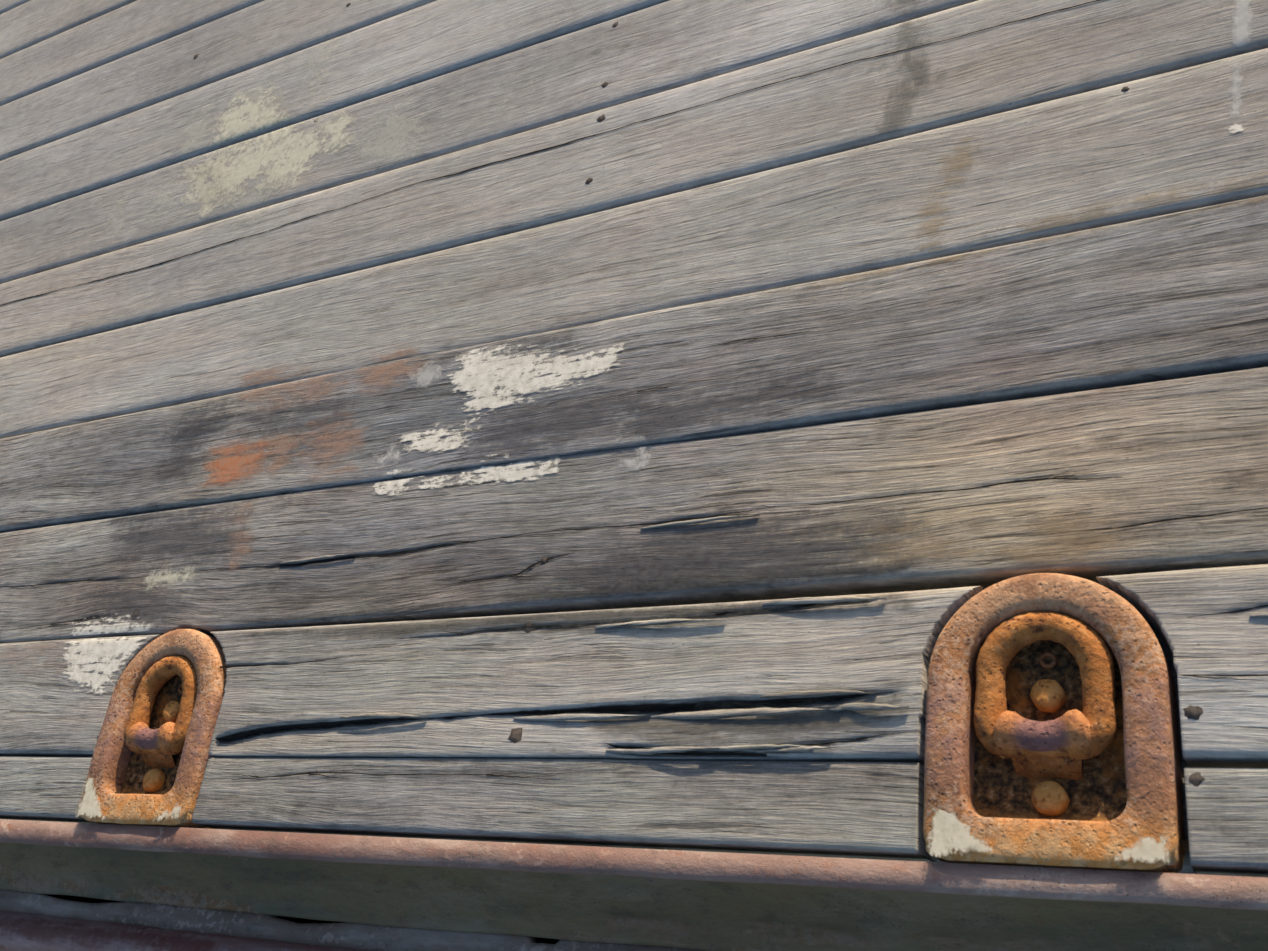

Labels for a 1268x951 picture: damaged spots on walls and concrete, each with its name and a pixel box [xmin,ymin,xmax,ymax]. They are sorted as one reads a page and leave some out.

rust [205,435,293,483]
crack [0,470,1122,589]
crack [12,614,110,630]
crack [415,596,886,638]
crack [215,689,909,757]
crack [232,772,544,780]